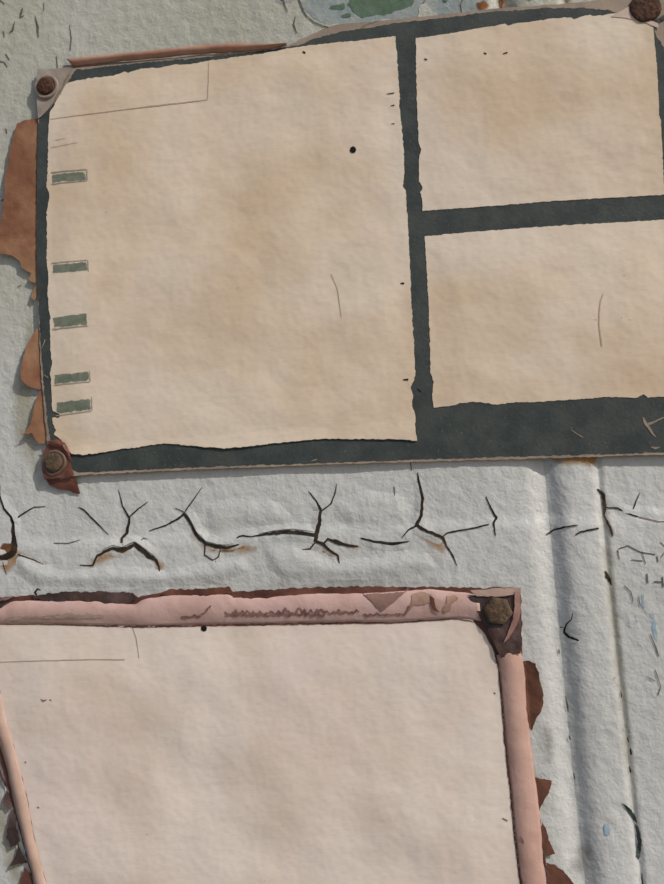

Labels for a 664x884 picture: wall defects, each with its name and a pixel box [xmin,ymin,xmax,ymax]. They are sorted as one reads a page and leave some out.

peeling [275,0,488,33]
rust [477,0,505,10]
crack [0,494,46,575]
crack [54,463,498,571]
crack [546,489,664,606]
peeling [641,595,659,656]